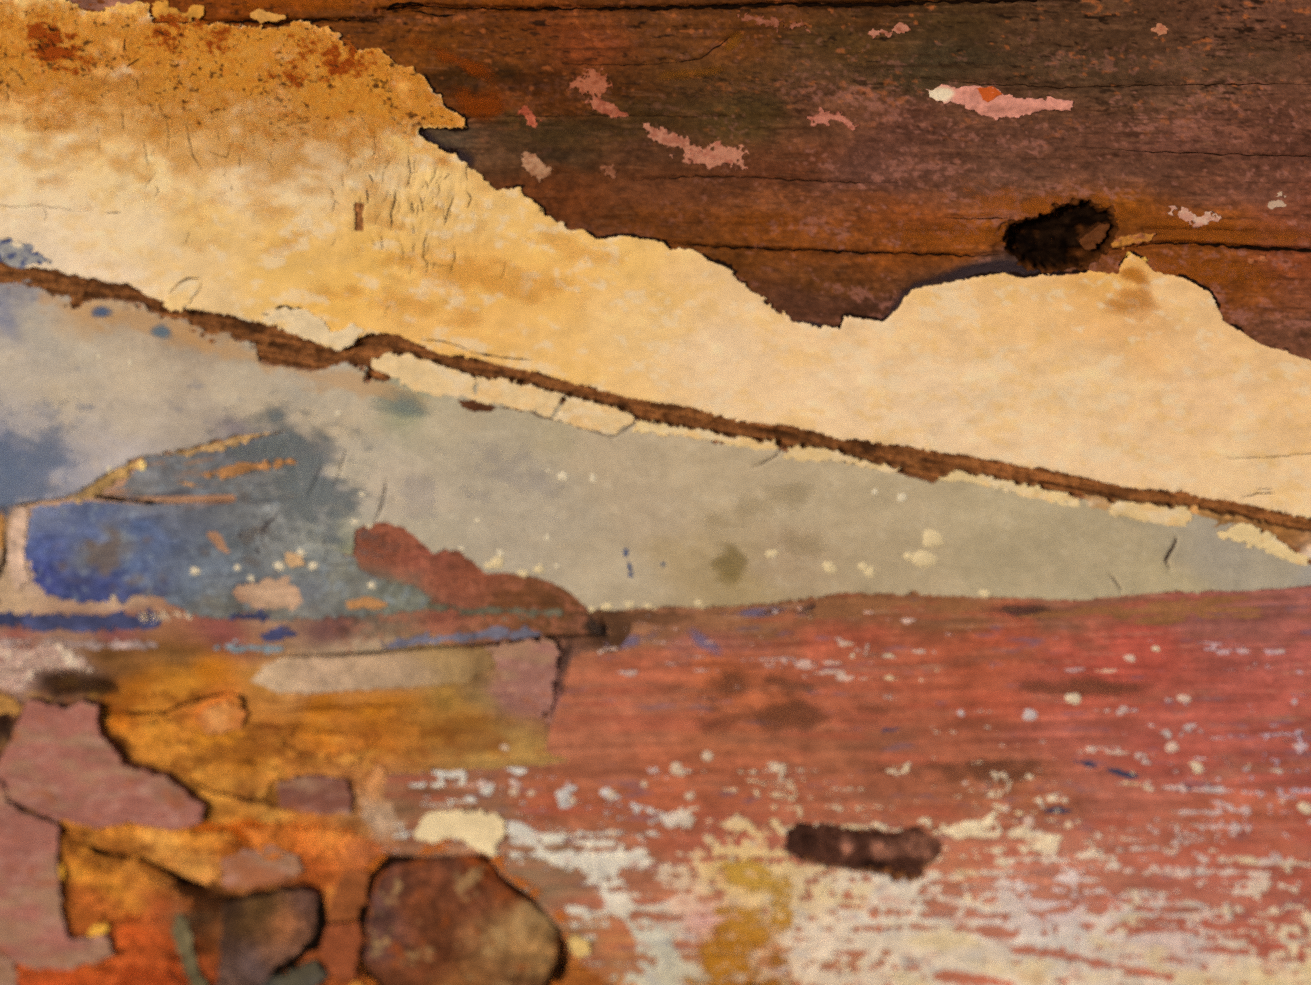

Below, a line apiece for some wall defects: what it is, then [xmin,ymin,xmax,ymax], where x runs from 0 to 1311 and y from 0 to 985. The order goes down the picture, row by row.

crack [152,0,1038,66]
crack [630,175,899,184]
peeling [0,0,1311,519]
crack [664,217,1011,257]
crack [1108,228,1311,252]
peeling [0,279,1311,985]